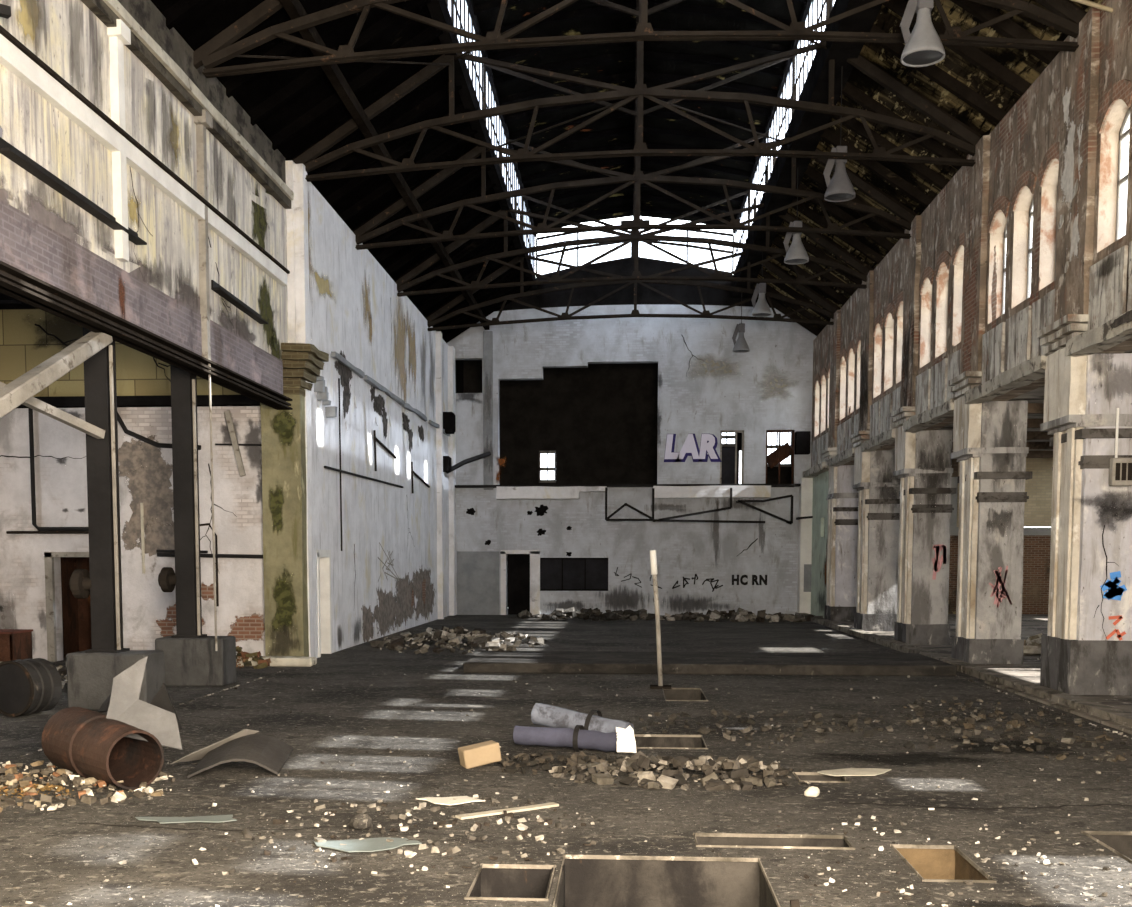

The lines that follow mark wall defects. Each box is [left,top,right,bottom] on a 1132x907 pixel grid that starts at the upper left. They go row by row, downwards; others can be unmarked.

flaking render [118,427,175,566]
damp [1099,507,1132,528]
flaking render [156,593,176,637]
flaking render [201,583,214,601]
flaking render [227,602,265,642]
damp [270,626,299,656]
flaking render [361,552,436,642]